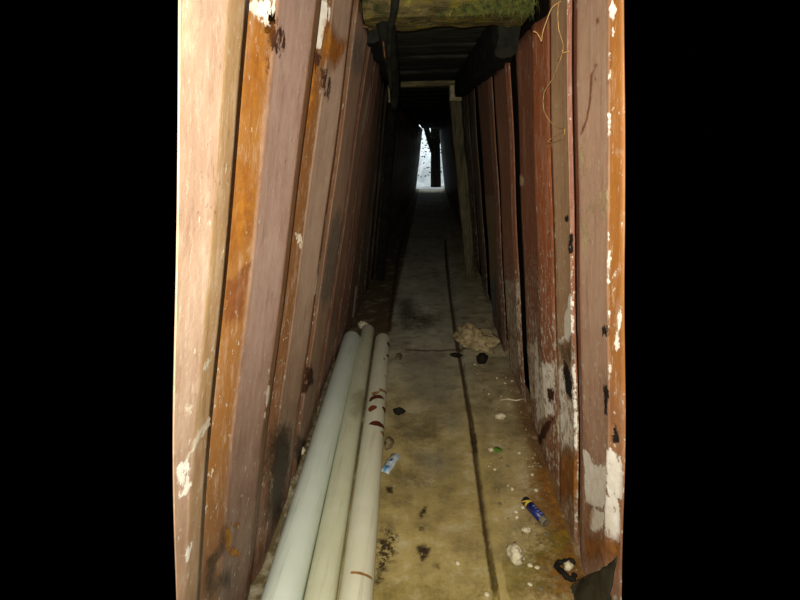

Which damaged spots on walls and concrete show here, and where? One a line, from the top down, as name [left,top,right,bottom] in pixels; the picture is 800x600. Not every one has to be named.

peeling [249,0,276,27]
peeling [558,290,574,344]
spalling [563,361,573,400]
spalling [538,417,555,445]
peeling [176,418,211,499]
peeling [583,447,623,542]